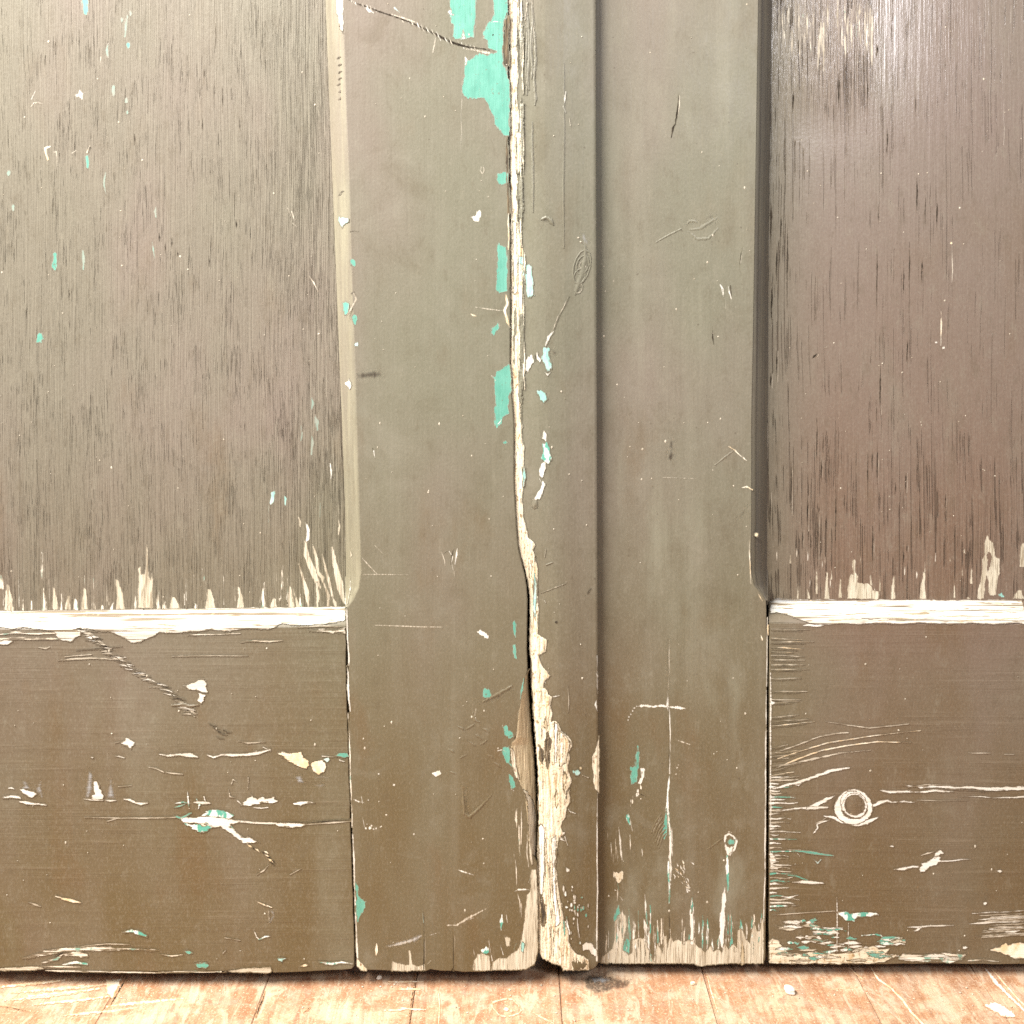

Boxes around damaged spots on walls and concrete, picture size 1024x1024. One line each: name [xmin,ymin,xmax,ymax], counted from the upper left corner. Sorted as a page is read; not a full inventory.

peeling [336,0,511,214]
crack [551,295,570,332]
peeling [491,331,554,429]
peeling [533,430,552,500]
peeling [769,592,1024,627]
peeling [0,606,346,717]
peeling [173,791,279,876]
peeling [206,747,350,775]
peeling [497,725,538,866]
peeling [707,831,739,949]
peeling [893,850,971,873]
peeling [990,929,1024,959]